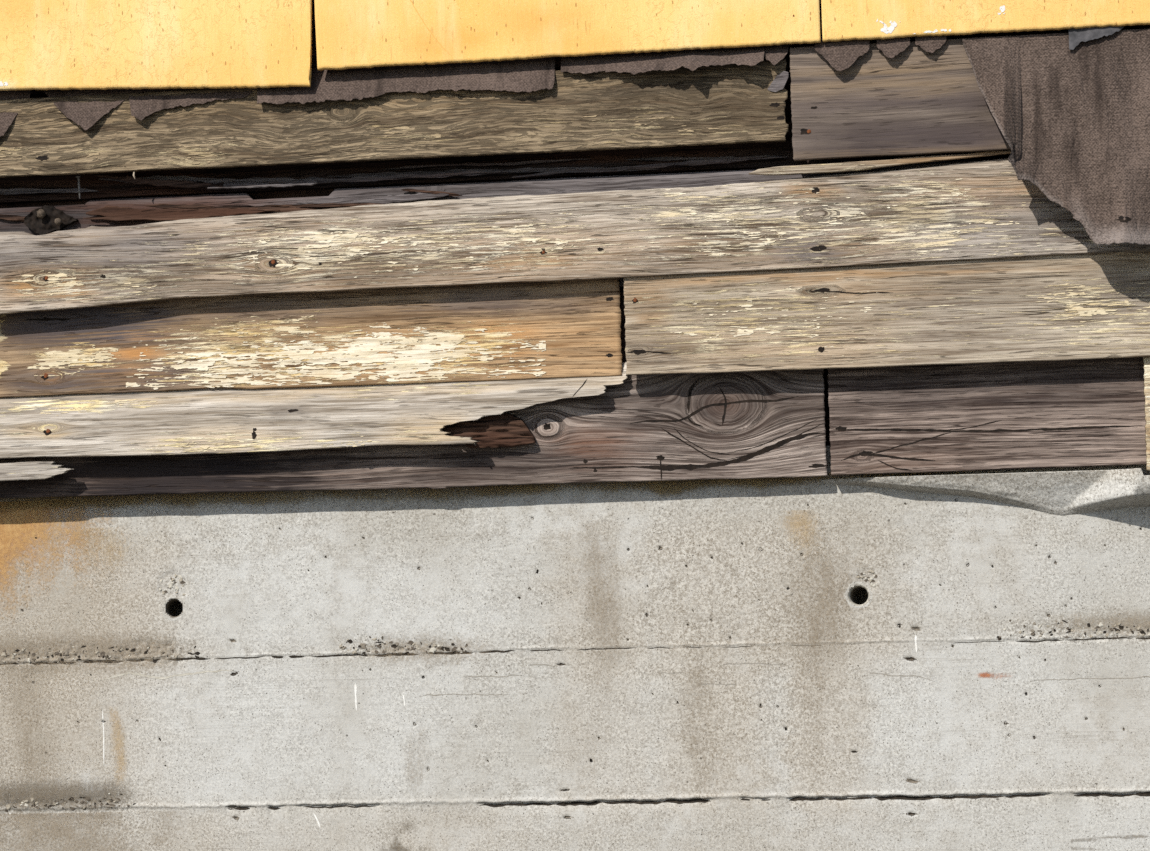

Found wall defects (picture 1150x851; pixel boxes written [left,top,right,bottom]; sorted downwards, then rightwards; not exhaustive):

peeling [1069,26,1124,50]
peeling [687,189,923,256]
peeling [913,210,1019,246]
peeling [1038,283,1150,335]
peeling [27,315,546,416]
peeling [158,436,271,453]